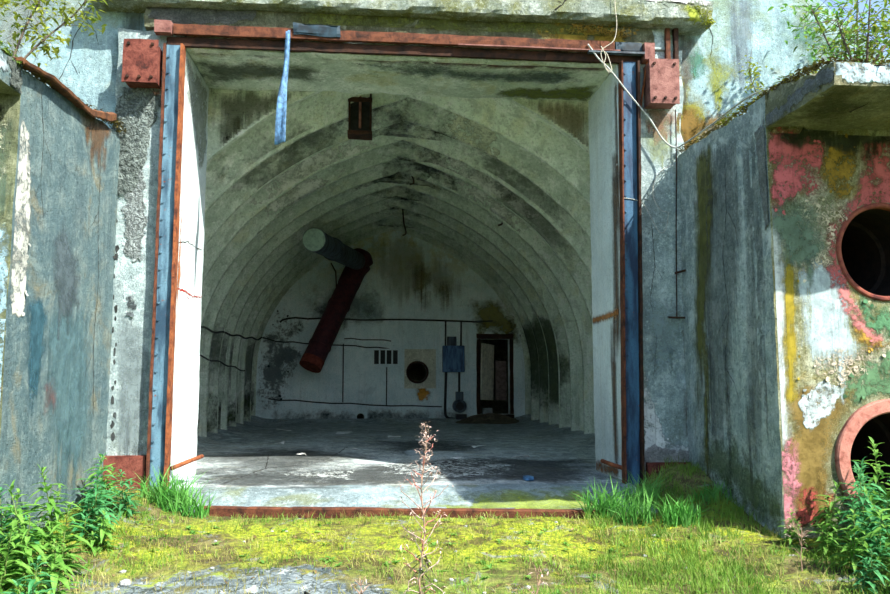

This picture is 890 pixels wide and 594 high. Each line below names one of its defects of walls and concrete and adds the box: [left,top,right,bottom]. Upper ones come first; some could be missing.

flaking render [0,121,31,398]
rust [86,113,109,159]
damp [221,92,291,143]
peeling [754,62,890,429]